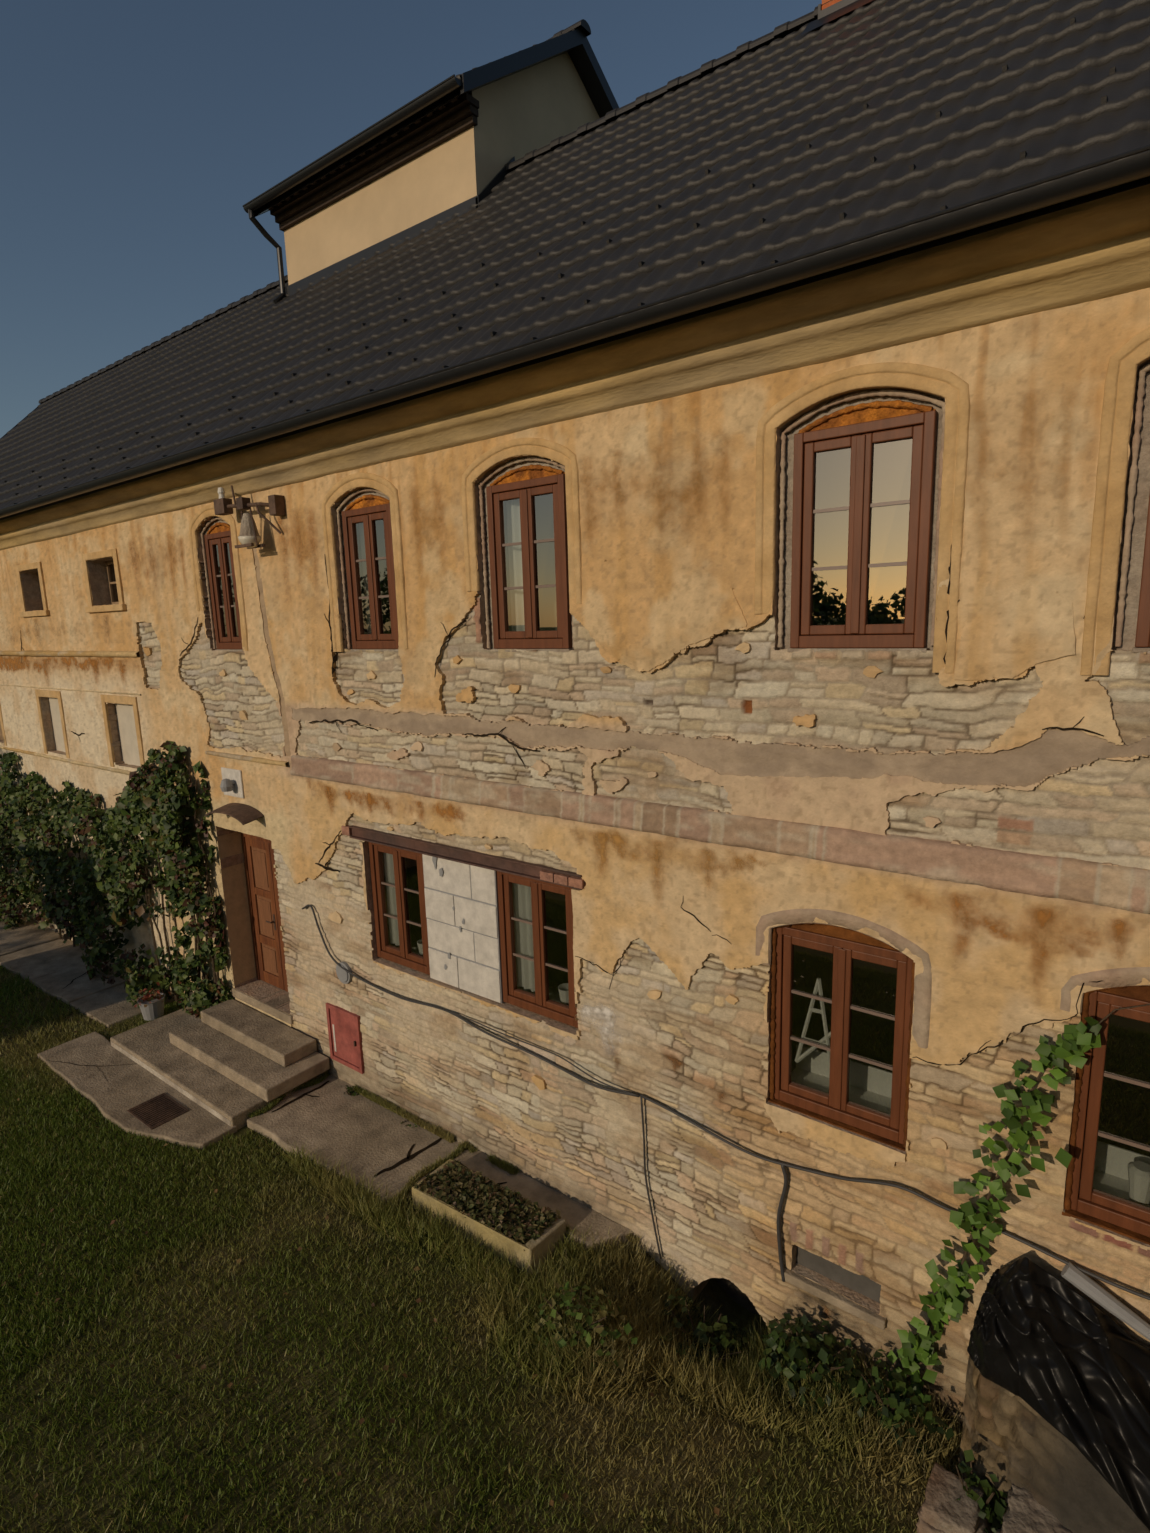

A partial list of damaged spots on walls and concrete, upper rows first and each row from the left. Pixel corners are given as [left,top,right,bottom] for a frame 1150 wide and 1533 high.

flaking render [139,622,162,689]
flaking render [180,594,1043,813]
flaking render [886,650,1150,870]
flaking render [274,814,1150,1426]